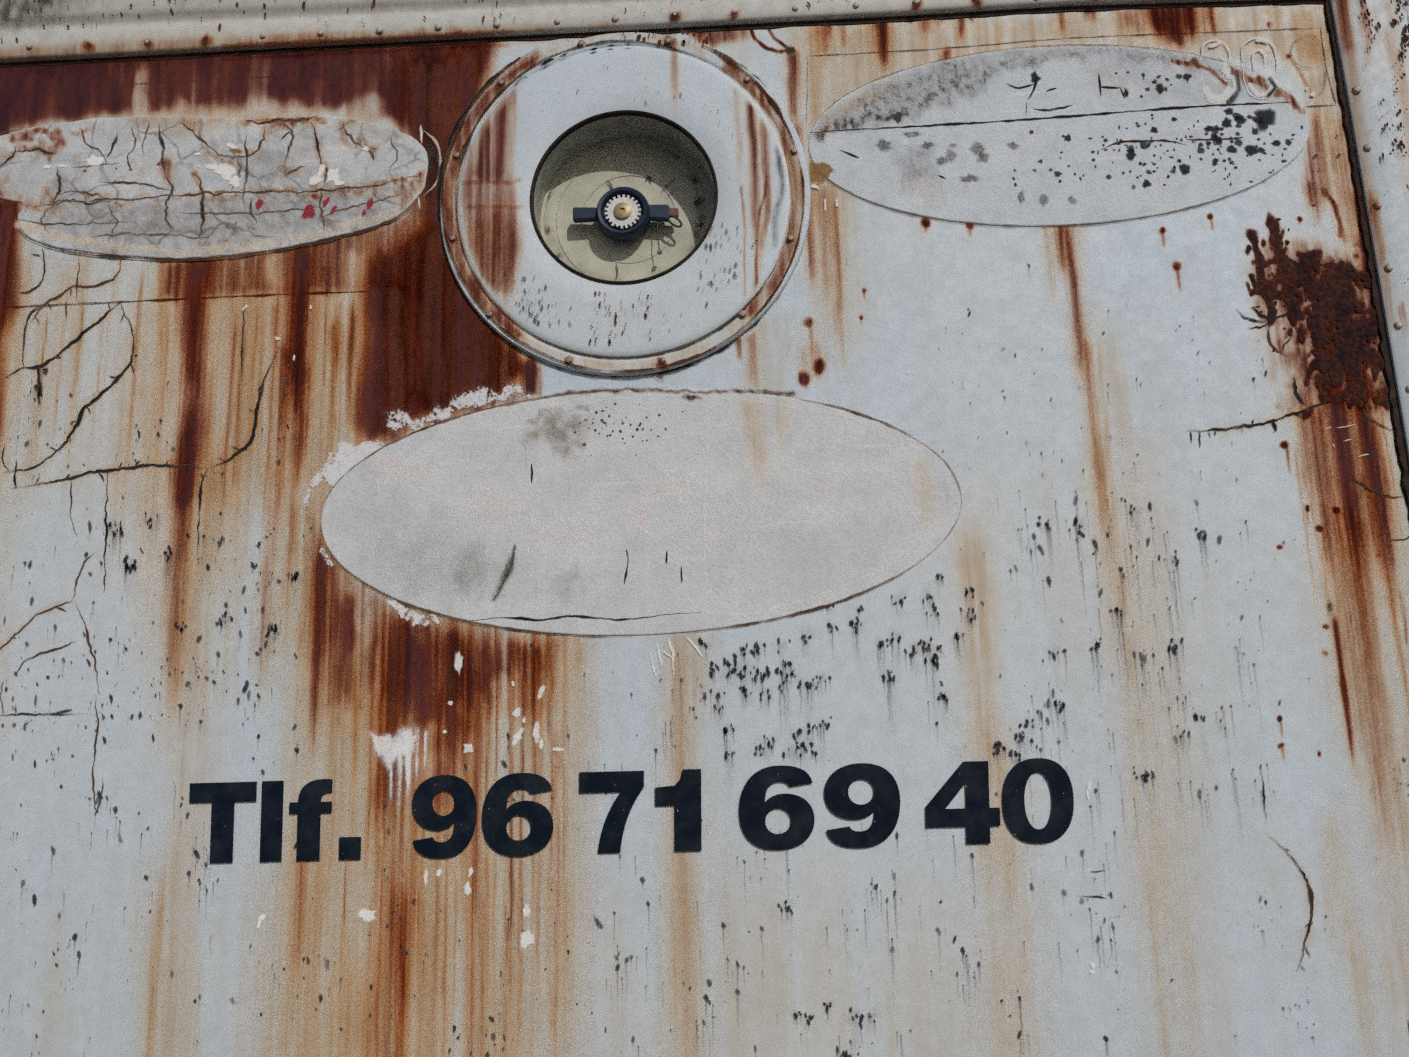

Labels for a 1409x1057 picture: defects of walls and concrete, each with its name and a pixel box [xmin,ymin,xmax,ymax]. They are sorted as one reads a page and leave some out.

crack [0,249,290,812]
corrosion [166,253,264,621]
corrosion [0,30,538,453]
corrosion [311,546,547,849]
spalling [493,546,516,600]
corrosion [692,13,812,315]
corrosion [1131,7,1215,46]
crack [1187,305,1394,446]
corrosion [1246,120,1394,654]
corrosion [1323,603,1353,751]
crack [1347,476,1403,498]
crack [1261,772,1314,972]